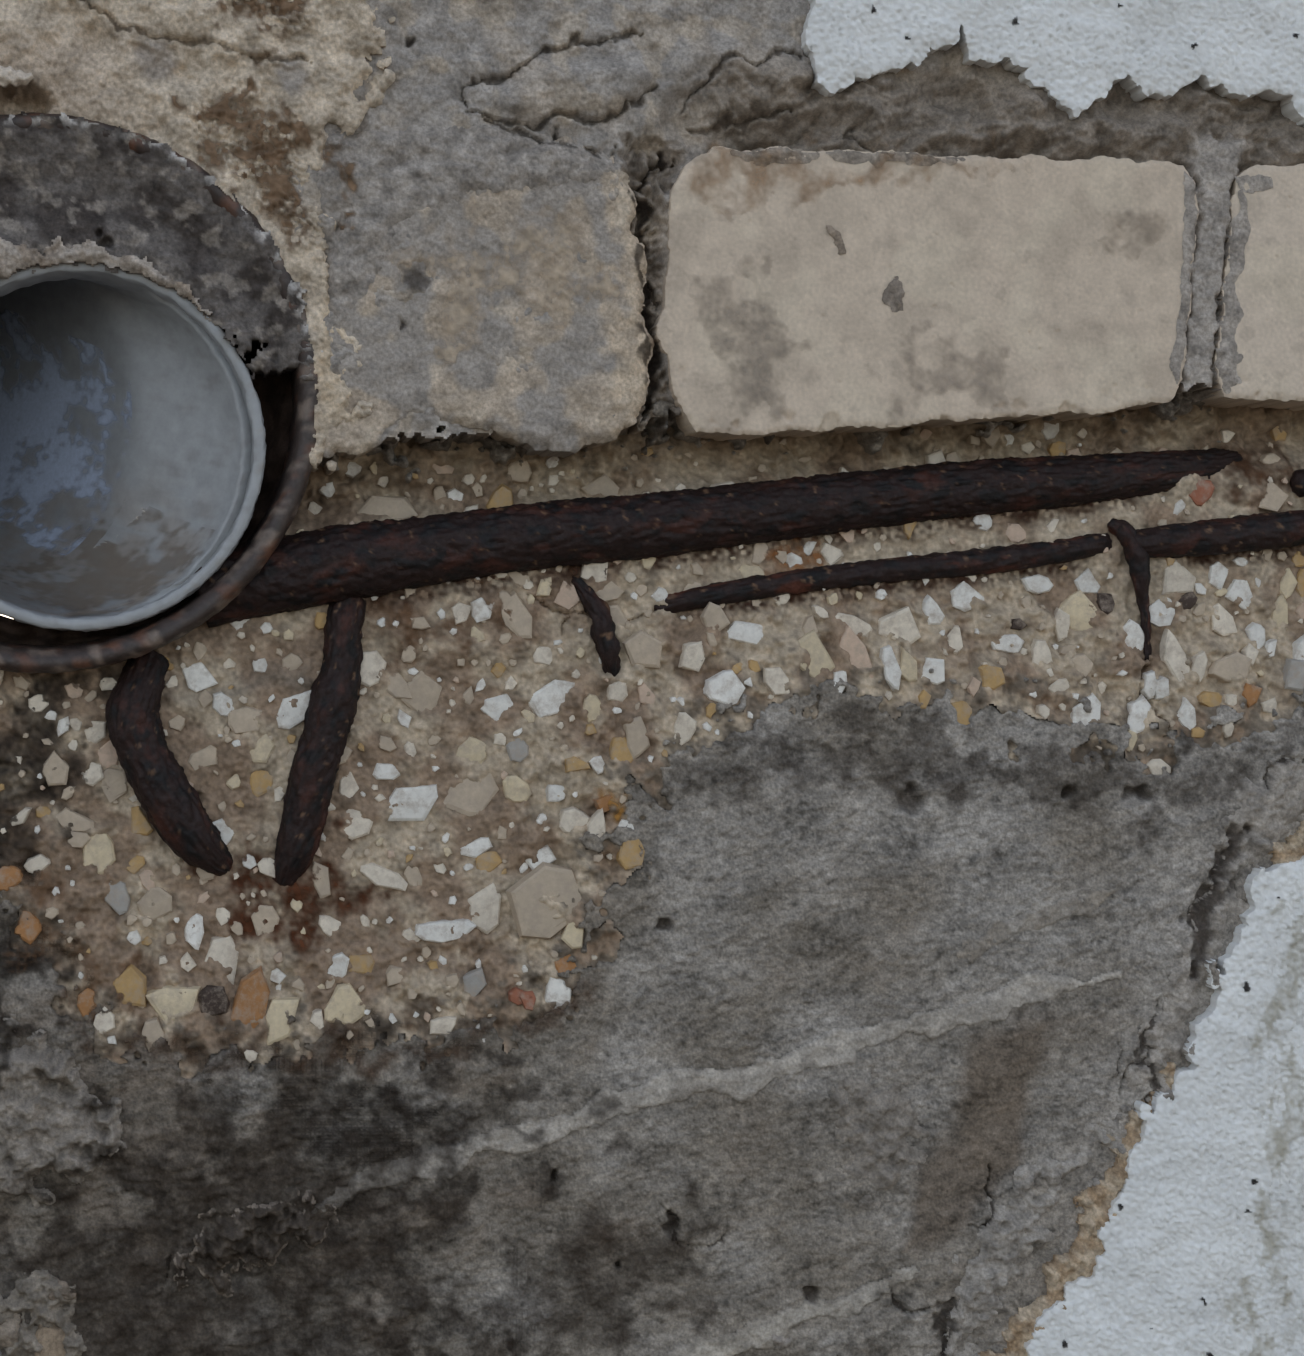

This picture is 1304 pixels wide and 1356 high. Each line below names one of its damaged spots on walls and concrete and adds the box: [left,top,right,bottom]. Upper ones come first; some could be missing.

crack [629,190,658,415]
rust [370,571,527,661]
spalling [0,0,1304,1079]
rust [722,591,822,610]
rust [769,528,882,572]
rust [841,574,993,596]
leakage [0,669,119,880]
rust [227,849,390,953]
leakage [0,920,61,977]
leakage [0,1014,42,1069]
leakage [10,1060,477,1356]
crack [891,1294,955,1356]